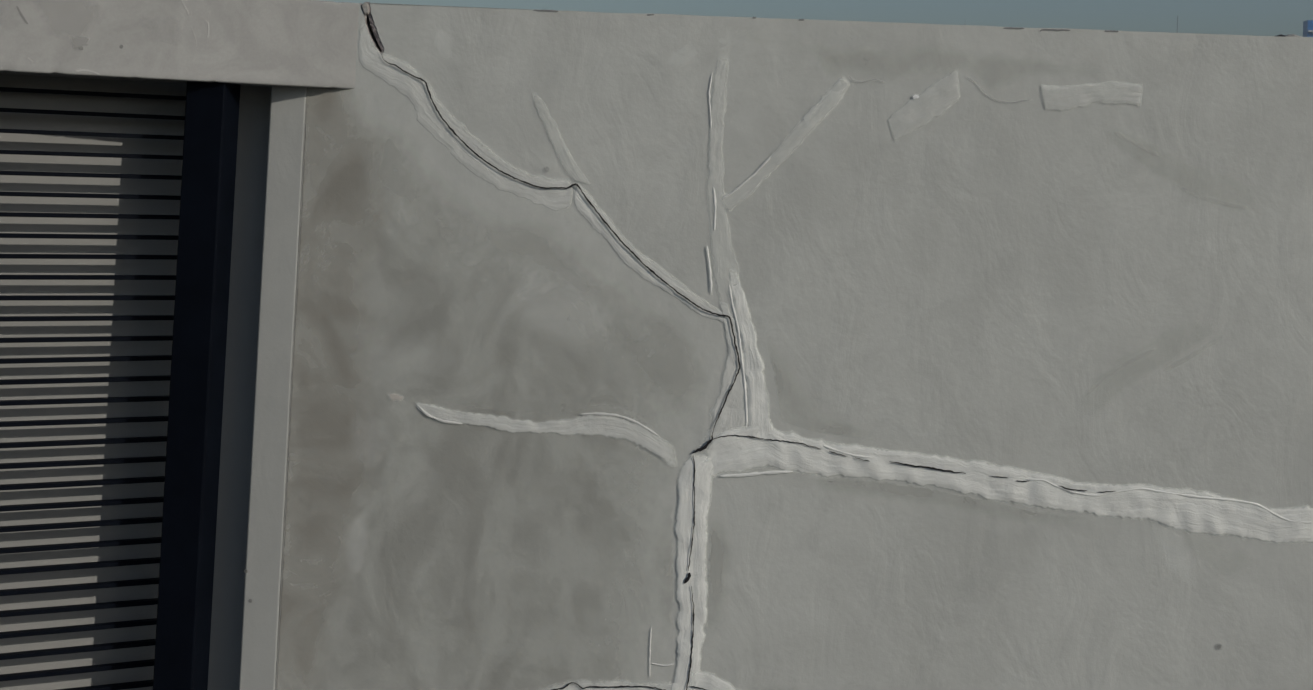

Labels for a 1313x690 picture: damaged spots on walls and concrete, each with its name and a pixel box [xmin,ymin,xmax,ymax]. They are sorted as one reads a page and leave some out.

crack [361,2,1027,690]